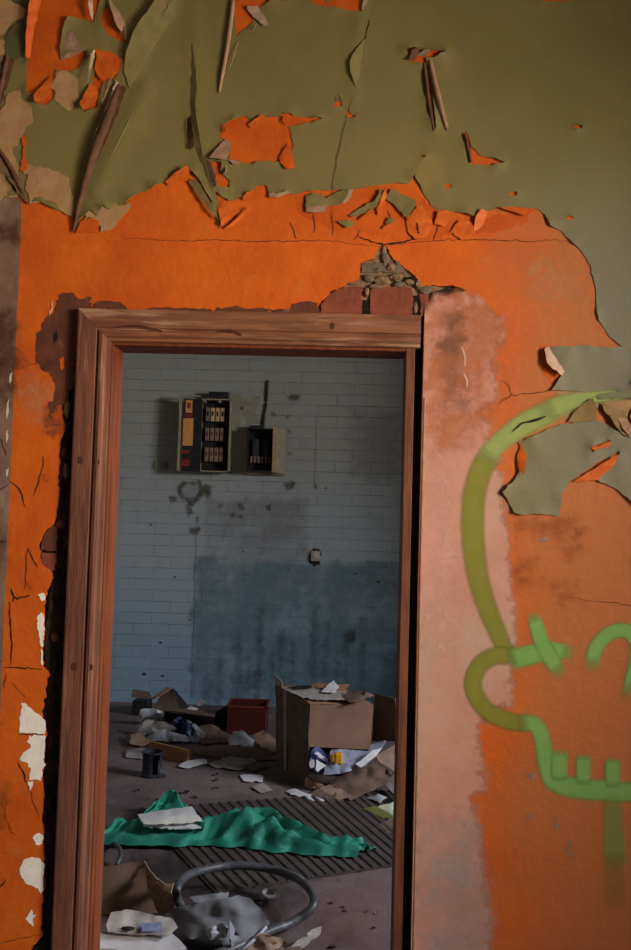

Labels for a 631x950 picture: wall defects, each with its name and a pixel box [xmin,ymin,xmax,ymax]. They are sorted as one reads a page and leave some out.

peeling [218,0,269,93]
peeling [0,0,131,233]
peeling [210,113,320,229]
crack [123,24,566,247]
crack [0,456,44,506]
water stain [170,481,211,513]
crack [498,381,551,405]
crack [512,416,546,432]
peeling [539,344,631,438]
crack [0,541,42,696]
flaking render [19,292,127,950]
flaking render [147,184,537,950]